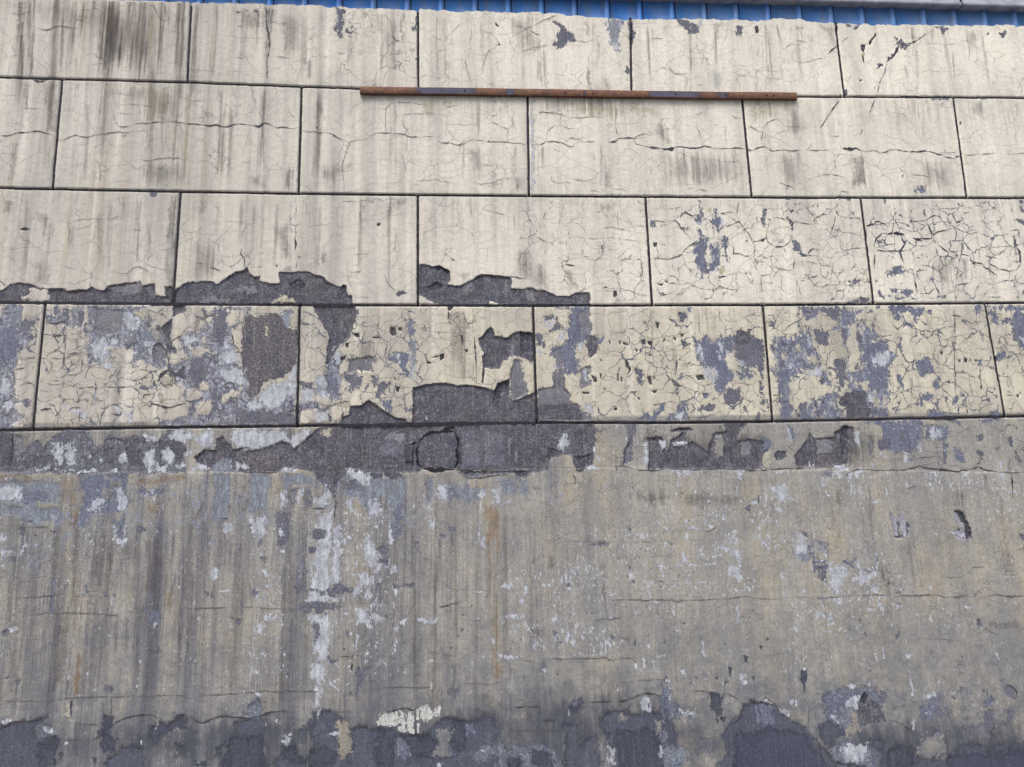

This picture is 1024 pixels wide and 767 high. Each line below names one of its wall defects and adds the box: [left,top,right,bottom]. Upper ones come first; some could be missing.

crack [222,5,289,74]
crack [877,29,970,93]
crack [0,84,1024,535]
flaking render [0,239,1024,568]
leakage [0,427,685,767]
crack [521,560,788,661]
leakage [491,470,908,663]
peeling [376,698,442,734]
leakage [717,698,866,767]
peeling [818,685,888,767]
leakage [880,719,1024,767]
peeling [920,678,1018,741]